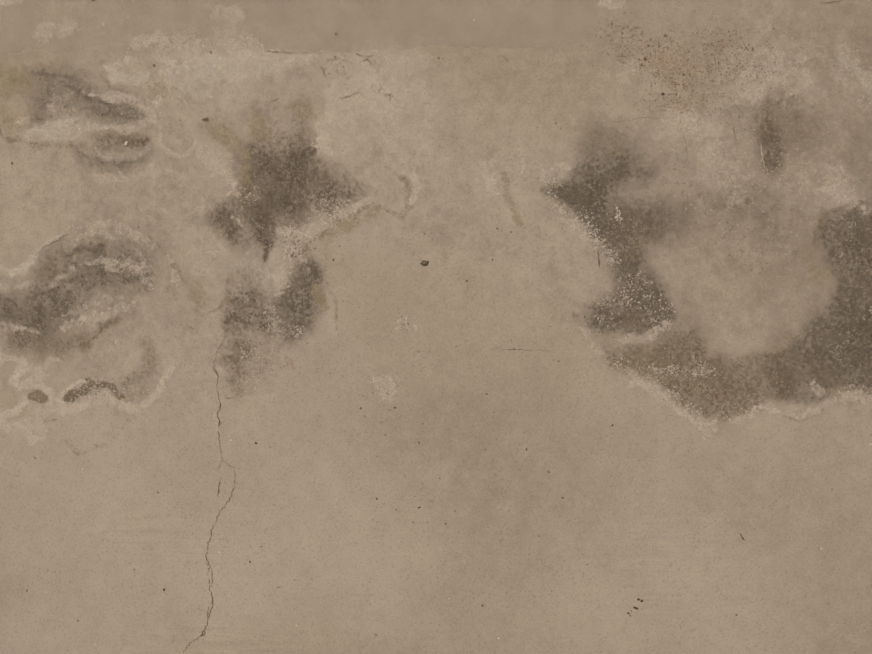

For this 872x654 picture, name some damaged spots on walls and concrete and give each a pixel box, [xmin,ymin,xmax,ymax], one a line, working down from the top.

damp [0,5,419,447]
damp [520,46,872,439]
crack [183,335,236,653]